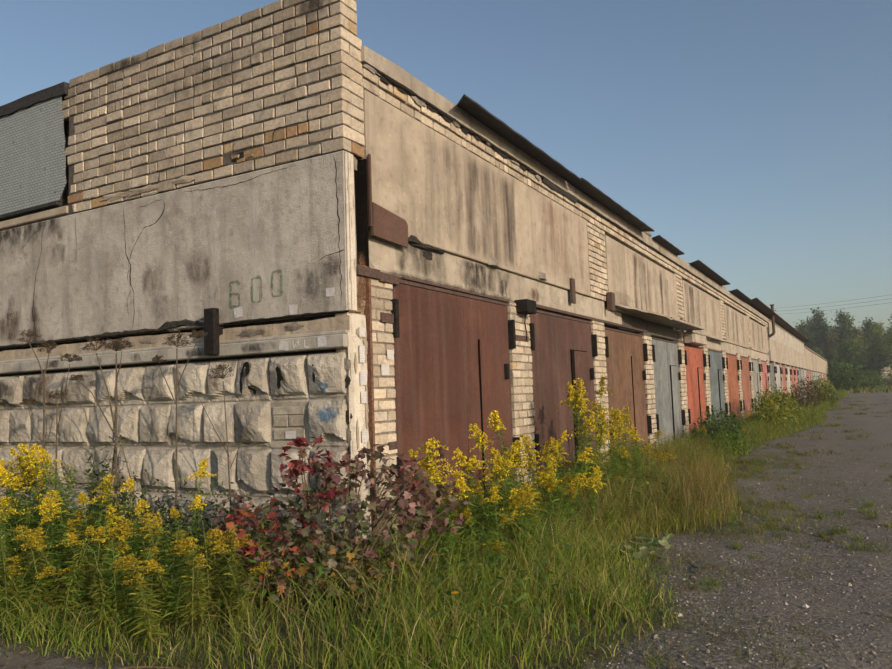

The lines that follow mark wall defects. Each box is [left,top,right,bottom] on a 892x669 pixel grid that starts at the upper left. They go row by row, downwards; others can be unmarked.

crack [123,199,165,328]
crack [320,156,345,305]
damp [444,262,510,300]